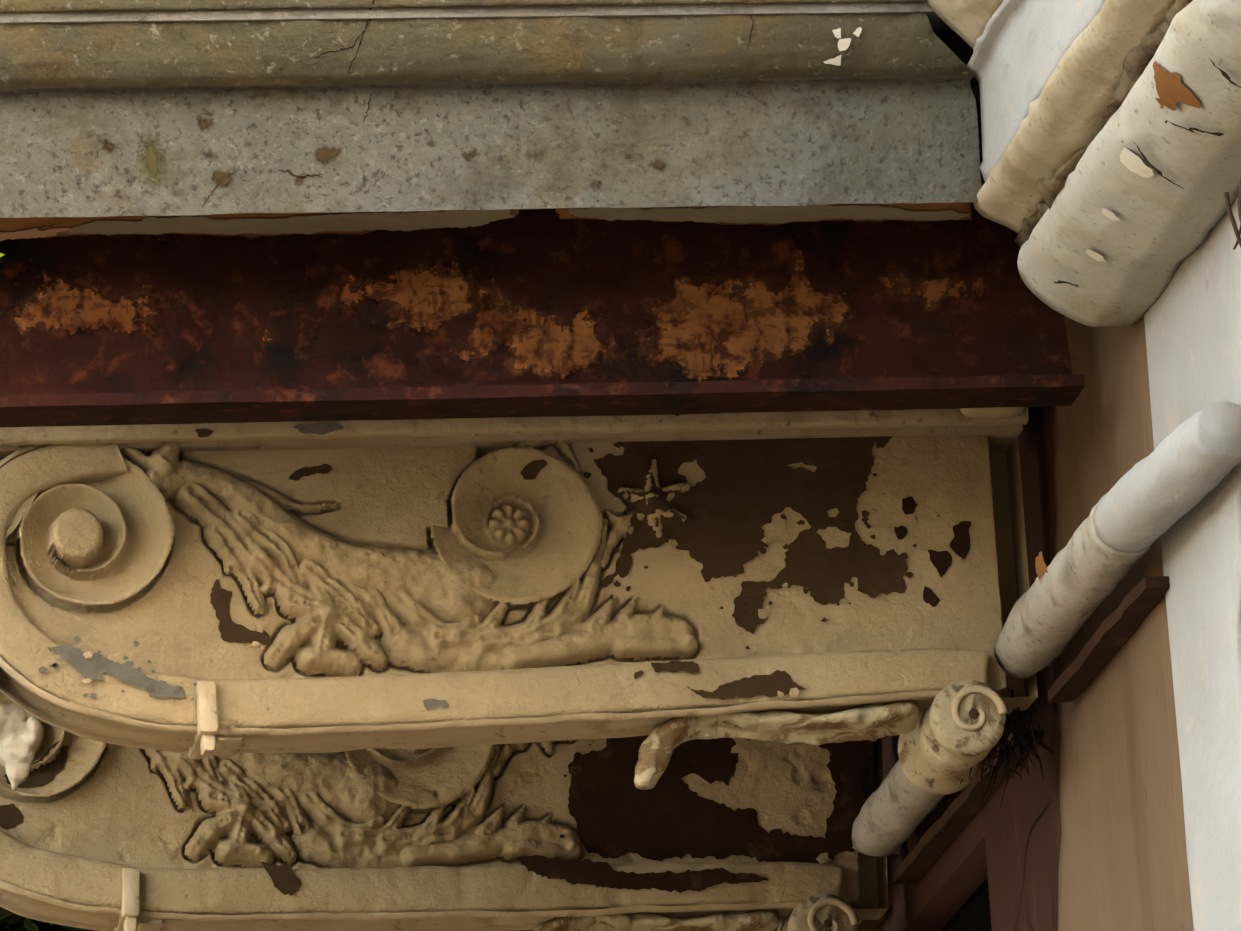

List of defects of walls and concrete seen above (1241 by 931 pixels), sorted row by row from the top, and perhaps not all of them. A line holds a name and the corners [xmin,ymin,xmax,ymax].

peeling [824,27,862,66]
spalling [1153,61,1201,110]
spalling [0,209,515,241]
rust [7,272,174,338]
rust [338,257,619,381]
rust [637,248,854,382]
rust [878,270,996,311]
peeling [583,436,971,649]
peeling [210,579,272,647]
peeling [634,660,807,700]
peeling [515,735,877,893]